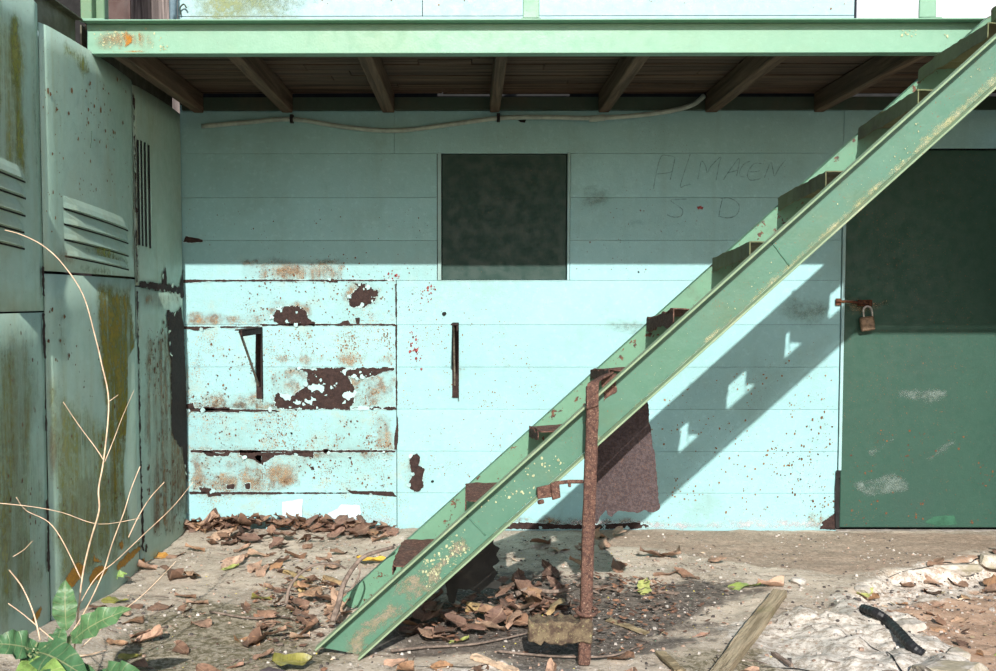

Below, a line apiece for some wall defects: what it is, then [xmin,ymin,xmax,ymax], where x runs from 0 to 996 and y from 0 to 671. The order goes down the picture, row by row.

corrosion [500,518,582,530]
corrosion [595,373,887,530]